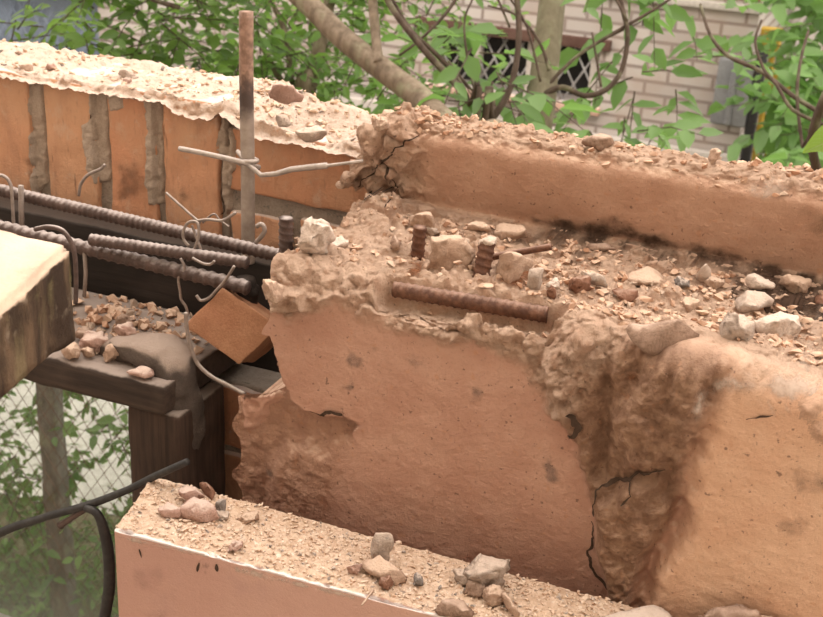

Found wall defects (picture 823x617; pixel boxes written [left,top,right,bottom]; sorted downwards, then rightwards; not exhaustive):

crack [358,135,419,208]
spalling [391,281,549,323]
spalling [242,377,286,430]
crack [586,470,664,590]